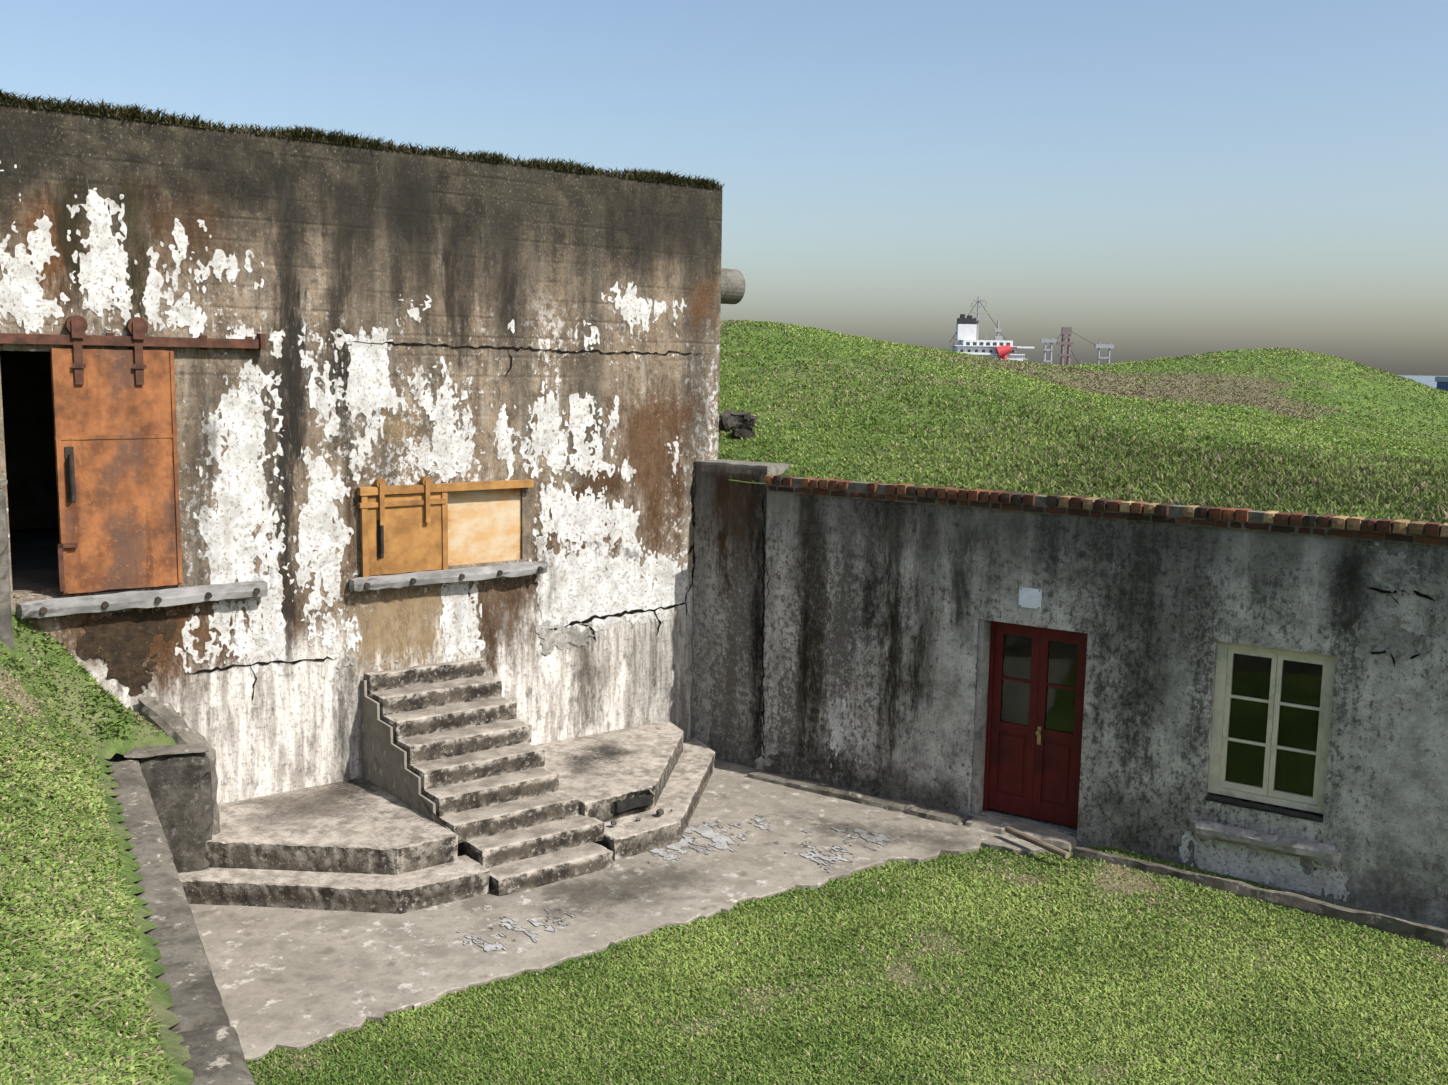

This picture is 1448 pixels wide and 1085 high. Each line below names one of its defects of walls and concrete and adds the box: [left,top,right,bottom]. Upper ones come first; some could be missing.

damp [328,190,352,350]
peeling [574,315,605,354]
peeling [601,281,687,335]
peeling [0,188,476,696]
crack [184,656,334,701]
peeling [439,581,485,662]
peeling [490,380,716,748]
crack [550,458,696,640]
damp [885,501,905,697]
spalling [1369,541,1429,595]